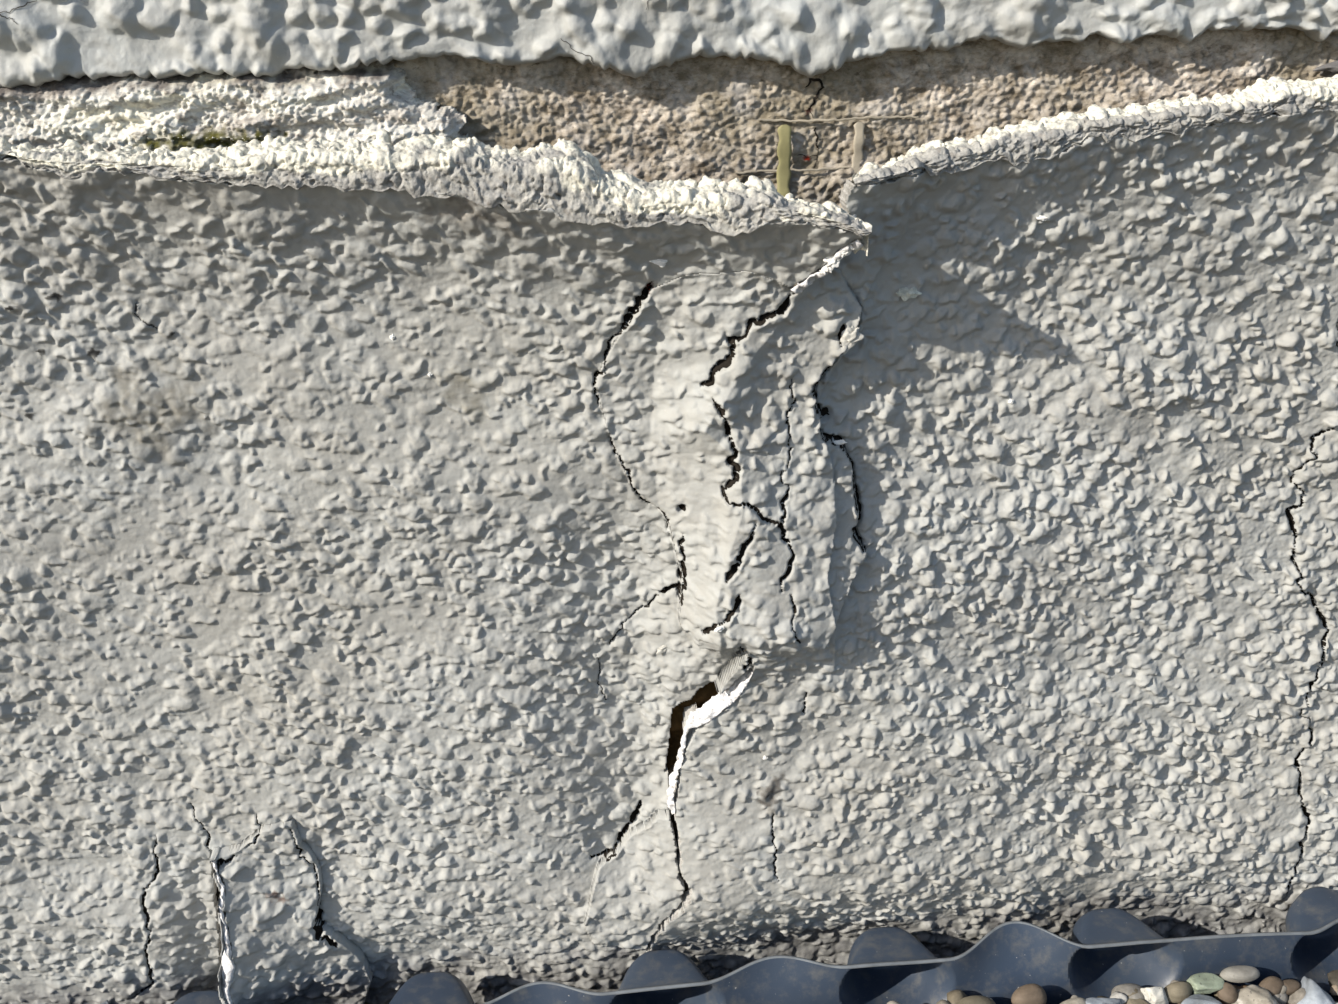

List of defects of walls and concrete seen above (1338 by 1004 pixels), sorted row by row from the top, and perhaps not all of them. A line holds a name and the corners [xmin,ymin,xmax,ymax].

spalling [0,27,1338,190]
crack [593,281,652,404]
flaking render [0,129,873,1004]
crack [596,436,687,700]
crack [701,293,866,670]
flaking render [645,74,1338,980]
crack [1285,428,1335,895]
crack [134,841,160,997]
crack [192,805,337,947]
crack [590,762,689,892]
crack [771,813,779,881]